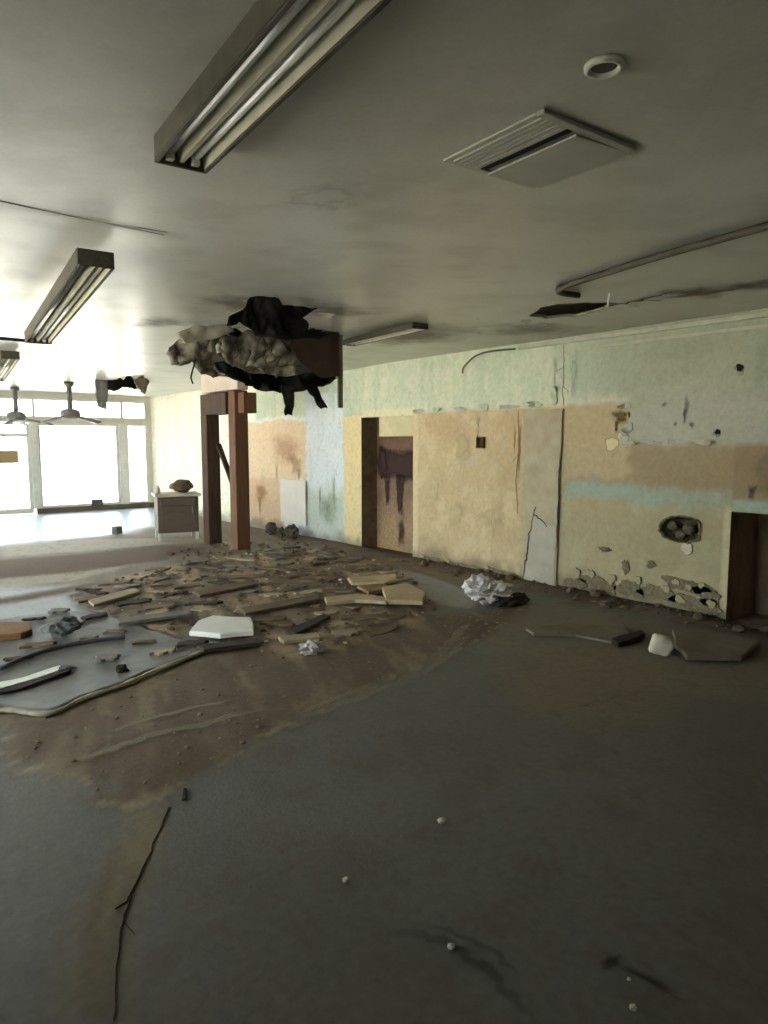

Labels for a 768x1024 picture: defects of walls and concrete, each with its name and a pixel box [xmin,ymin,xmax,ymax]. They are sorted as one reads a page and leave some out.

crack [612,292,672,306]
peeling [617,402,721,447]
damp [377,446,413,541]
crack [514,426,560,578]
spalling [657,515,702,555]
flaking render [563,560,722,615]
crack [113,807,169,1021]